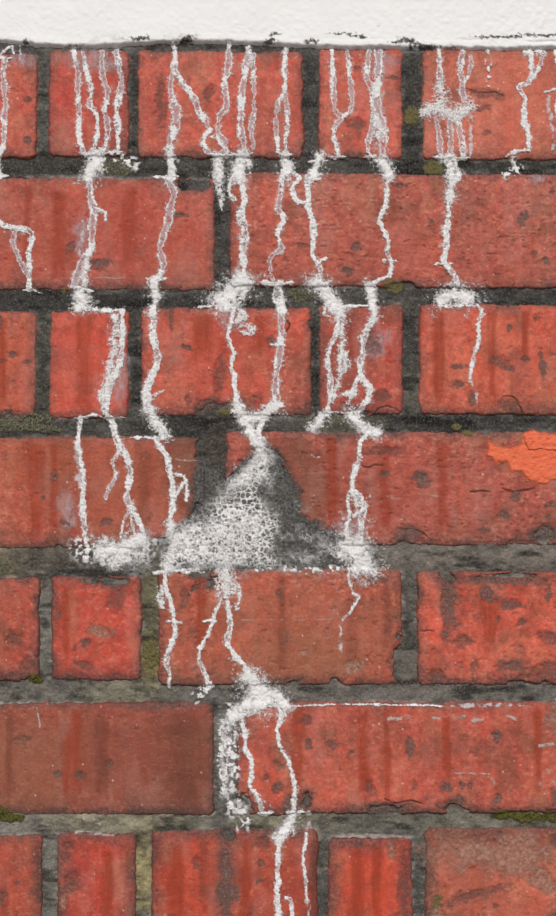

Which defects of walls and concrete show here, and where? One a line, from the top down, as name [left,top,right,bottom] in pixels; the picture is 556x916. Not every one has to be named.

leakage [0,39,29,179]
leakage [475,32,556,179]
leakage [0,220,40,293]
leakage [67,35,487,916]